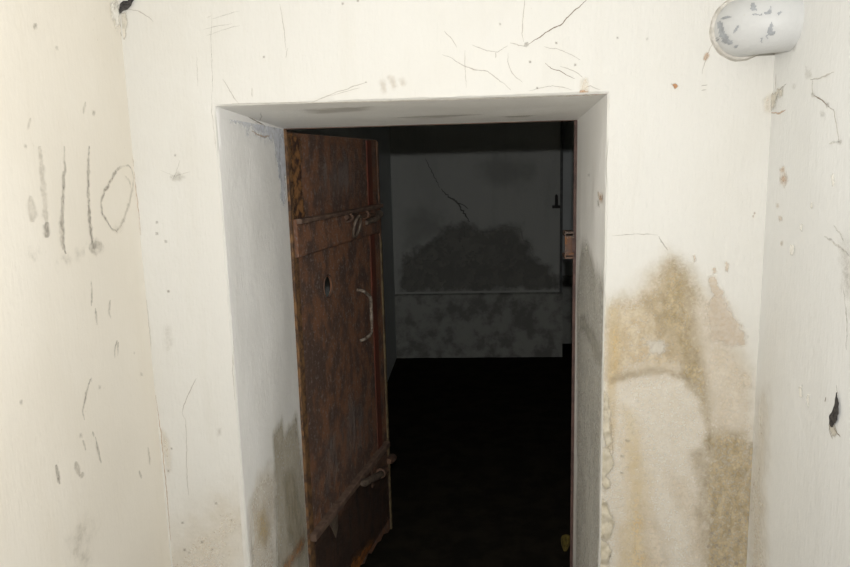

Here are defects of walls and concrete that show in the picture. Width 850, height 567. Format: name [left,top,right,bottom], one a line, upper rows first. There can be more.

spalling [111,0,134,39]
crack [529,0,586,44]
water stain [708,268,745,345]
spalling [825,392,840,437]
water stain [274,419,308,567]
water stain [706,433,753,567]